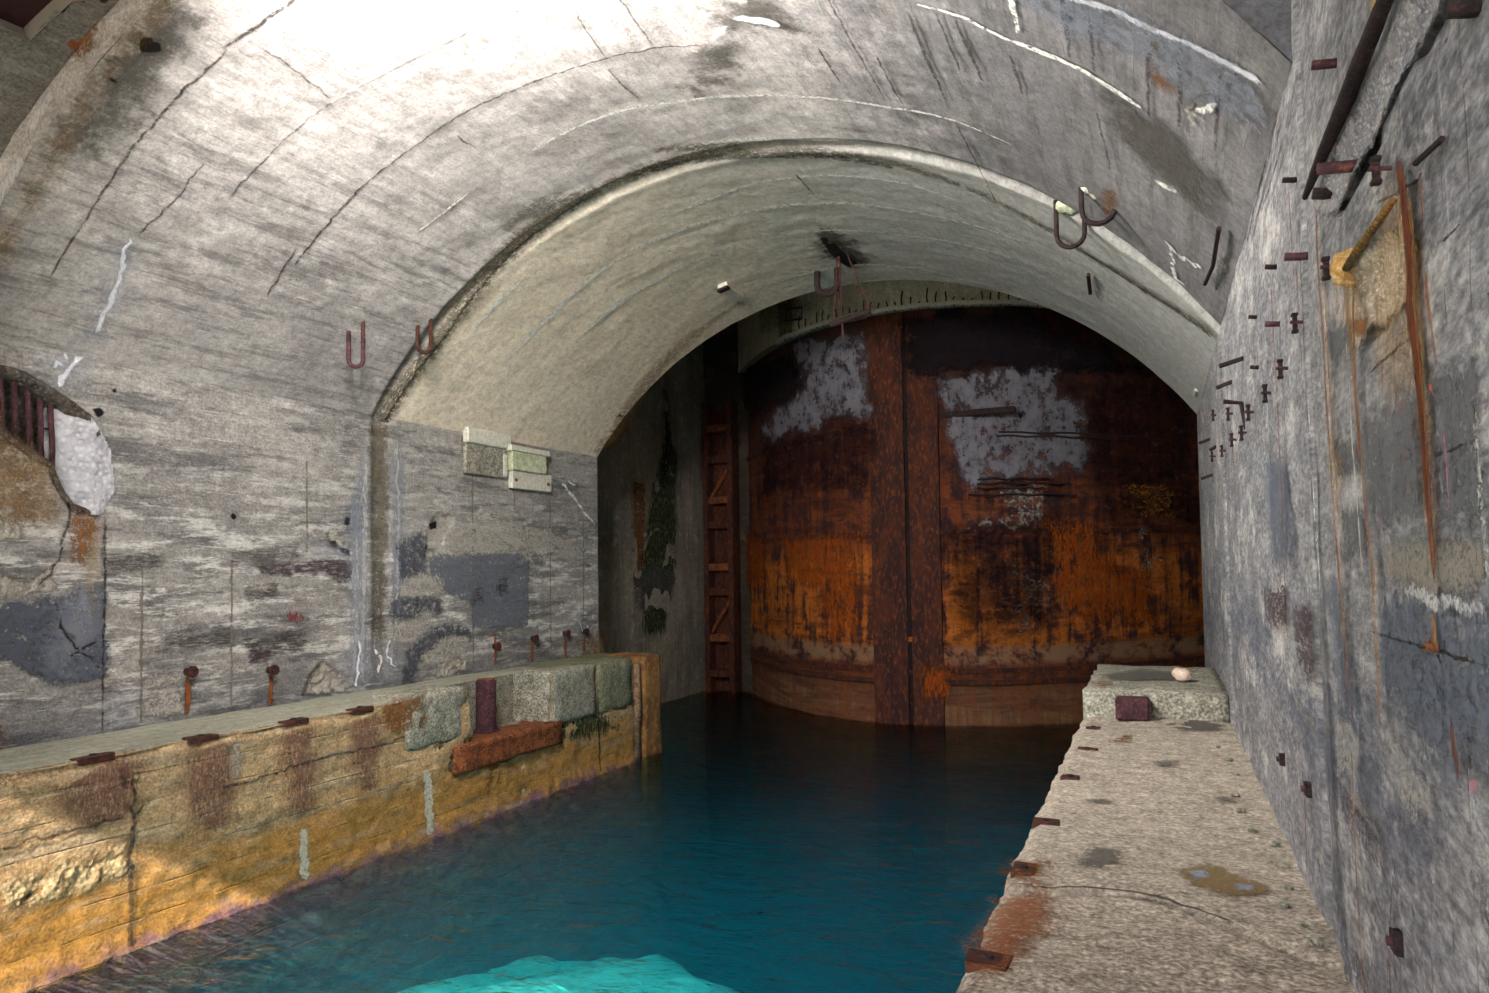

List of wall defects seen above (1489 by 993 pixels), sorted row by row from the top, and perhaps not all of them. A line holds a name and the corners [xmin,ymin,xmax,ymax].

water stain [28,6,205,160]
crack [51,0,330,275]
crack [268,0,697,294]
water stain [690,0,802,97]
crack [908,15,1023,198]
spalling [0,364,114,517]
water stain [351,141,1212,686]
rust [1396,158,1435,577]
spalling [0,569,57,598]
rust [353,696,426,789]
crack [0,779,144,946]
rust [964,861,1052,975]